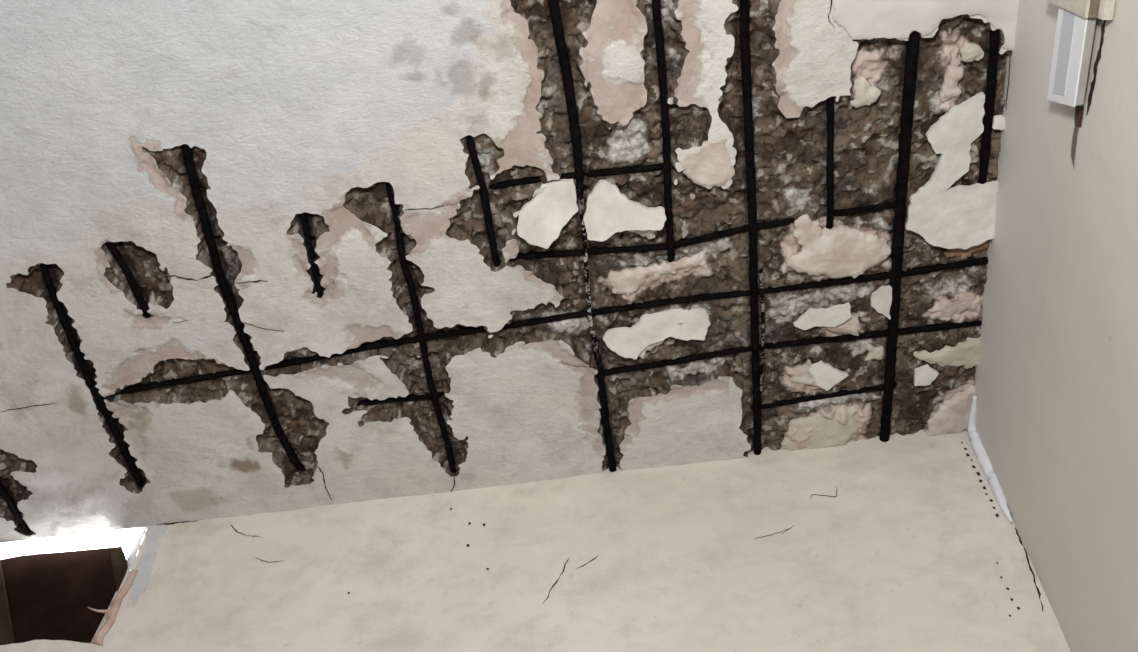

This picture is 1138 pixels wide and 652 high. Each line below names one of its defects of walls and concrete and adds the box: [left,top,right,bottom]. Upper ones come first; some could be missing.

spalling [0,449,38,536]
spalling [6,0,1019,494]